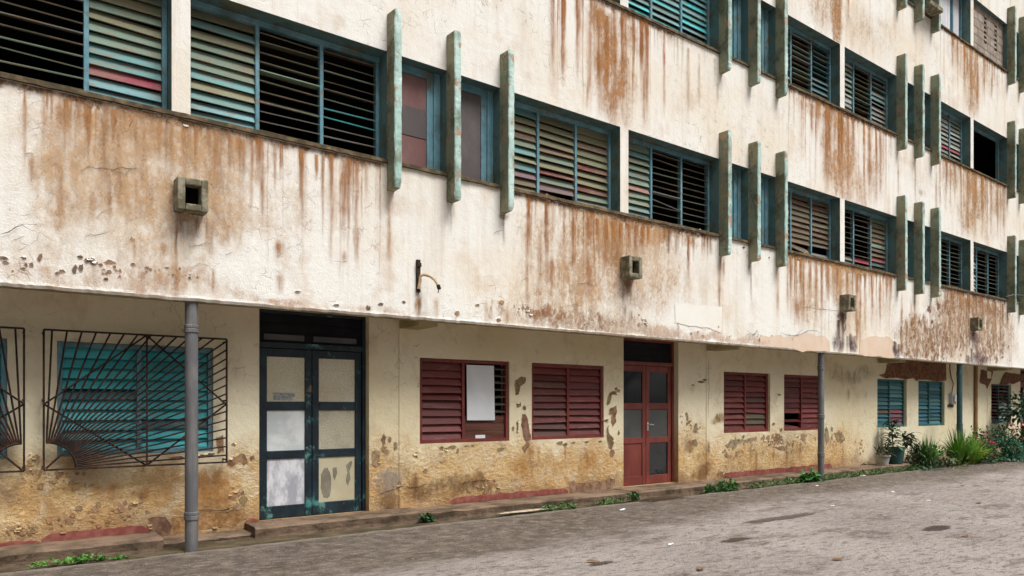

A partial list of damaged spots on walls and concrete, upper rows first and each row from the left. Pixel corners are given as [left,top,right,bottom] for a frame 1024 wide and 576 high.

flaking render [0,253,43,272]
peeling [879,299,1024,389]
rust [895,293,1013,364]
flaking render [21,453,94,491]
peeling [198,435,255,467]
peeling [371,433,398,467]
peeling [512,376,531,453]
peeling [556,387,620,458]
peeling [722,422,867,465]
flaking render [5,495,185,537]
flaking render [198,487,248,530]